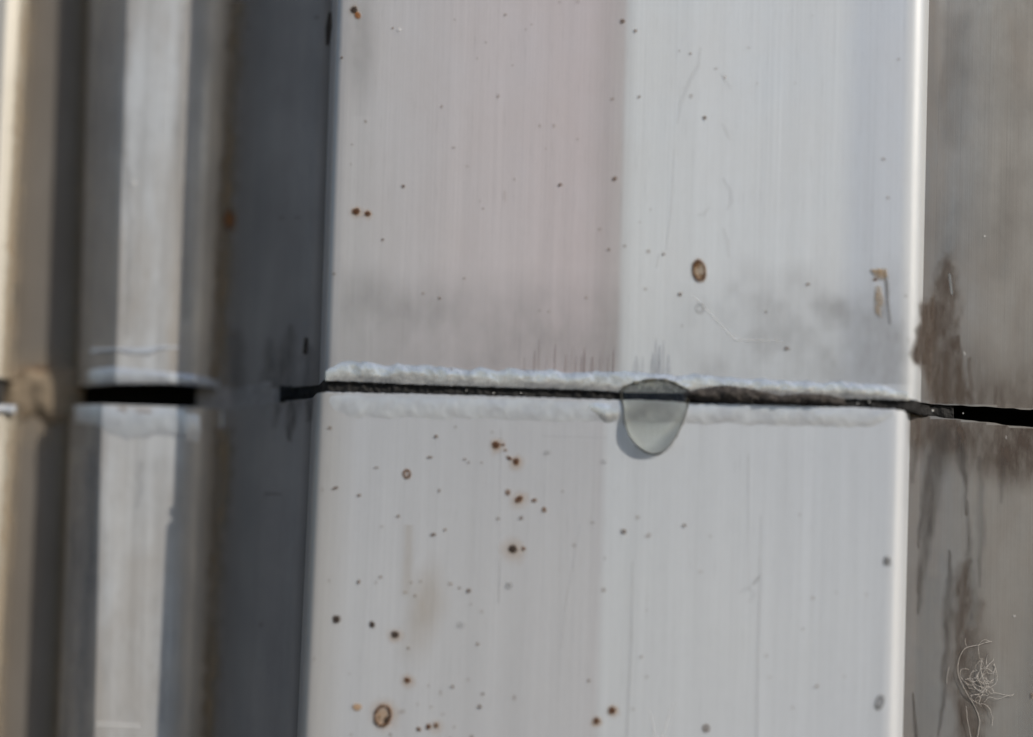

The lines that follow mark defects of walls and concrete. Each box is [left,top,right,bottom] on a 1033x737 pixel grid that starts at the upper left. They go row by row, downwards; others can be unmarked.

rust [693,259,706,281]
damp [914,261,971,404]
rust [374,705,392,727]
damp [945,567,985,737]